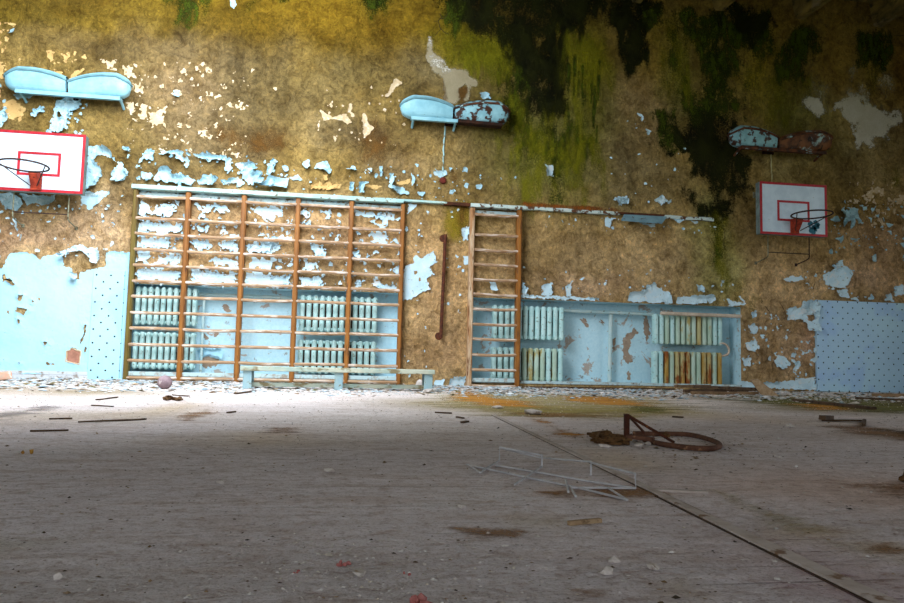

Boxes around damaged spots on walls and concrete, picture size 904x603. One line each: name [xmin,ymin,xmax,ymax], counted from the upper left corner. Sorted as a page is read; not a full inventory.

peeling [0,22,88,134]
damp [426,36,478,104]
damp [438,0,666,204]
damp [649,1,778,263]
damp [802,67,903,149]
peeling [0,144,482,380]
damp [444,206,470,243]
peeling [521,271,599,301]
peeling [612,316,651,380]
peeling [628,269,822,391]
peeling [784,201,904,302]
damp [424,390,709,437]